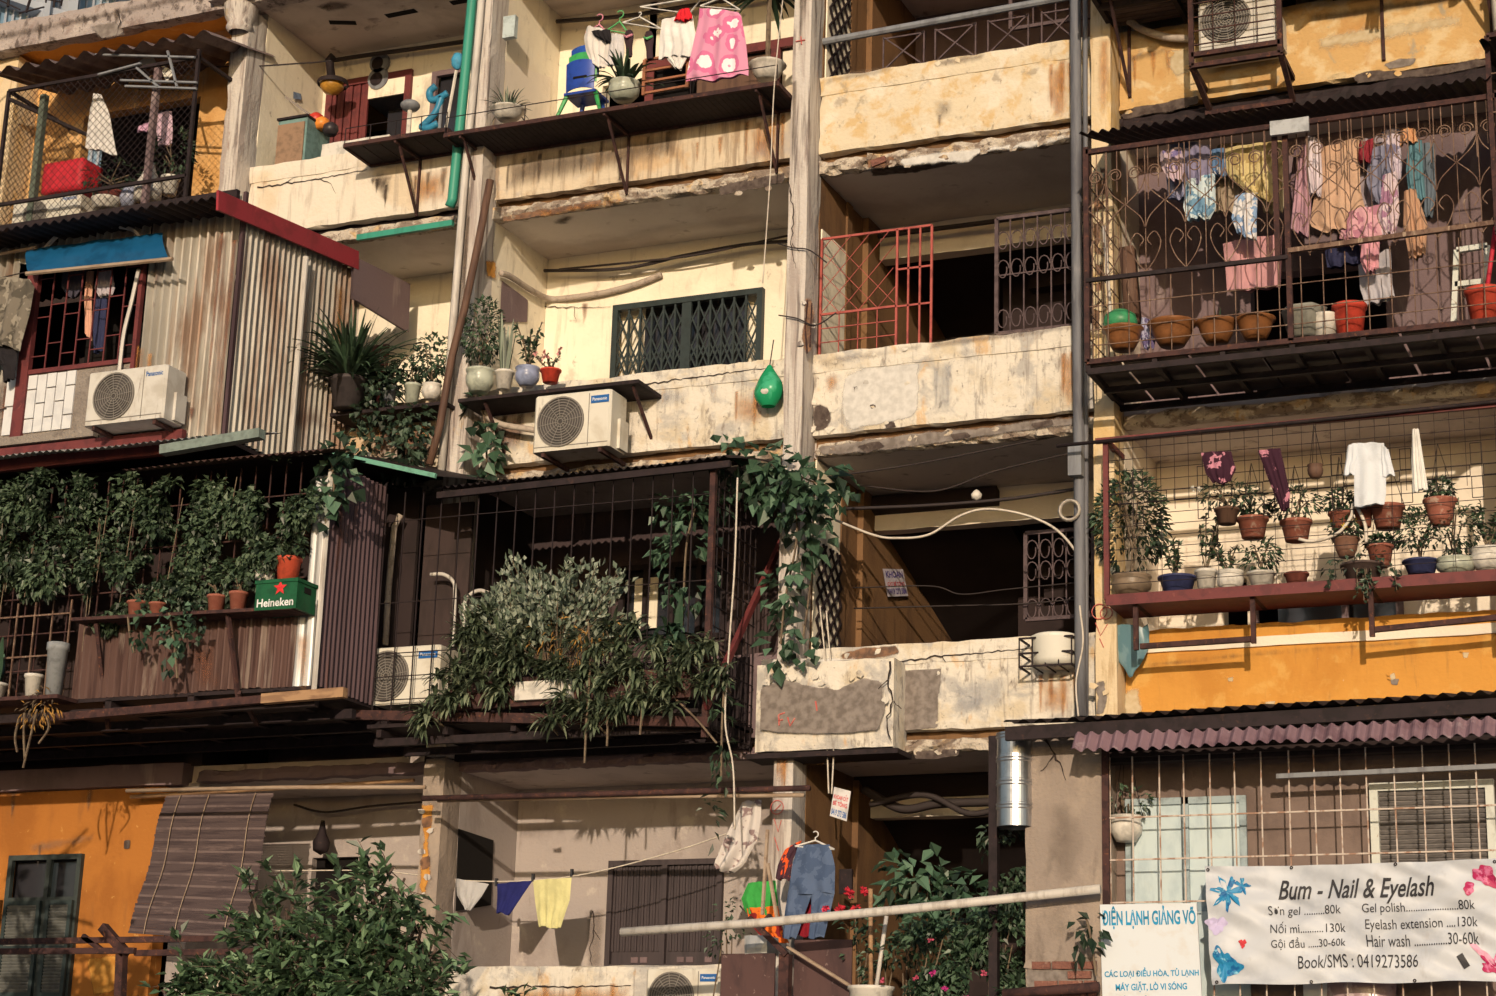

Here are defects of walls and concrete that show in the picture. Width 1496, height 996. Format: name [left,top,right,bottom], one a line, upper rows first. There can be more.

leakage [1319,0,1440,18]
spalling [867,136,1063,176]
spalling [719,173,784,195]
spalling [503,200,601,221]
peeling [811,347,1073,455]
spalling [760,646,941,734]
crack [878,648,1027,740]
spalling [914,748,959,759]